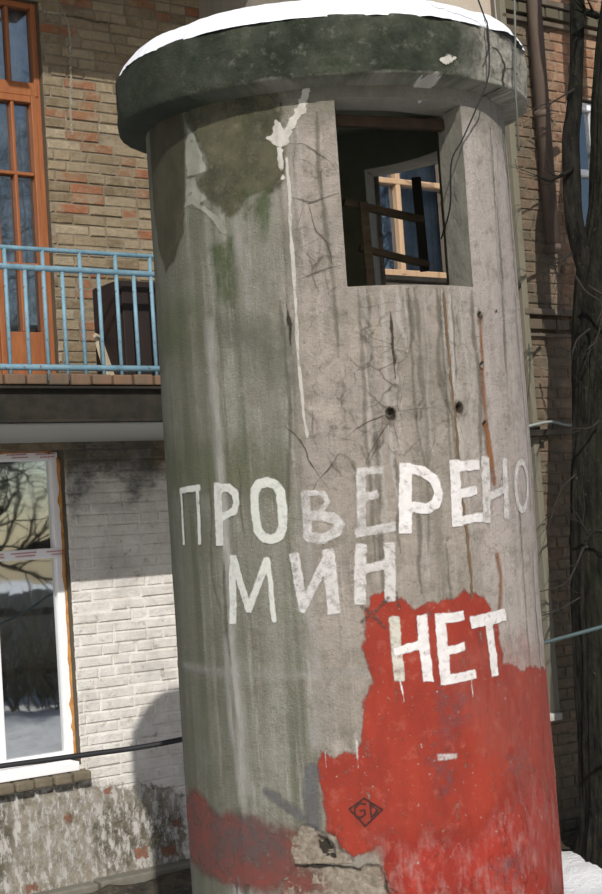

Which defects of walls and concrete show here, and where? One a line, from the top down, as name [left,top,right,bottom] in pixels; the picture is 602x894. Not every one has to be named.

peeling [184,126,227,234]
leakage [149,93,286,271]
leakage [213,238,233,299]
crack [285,304,293,345]
crack [296,193,341,279]
crack [377,312,400,390]
crack [442,292,474,599]
rust [480,319,496,485]
leakage [217,457,230,569]
leakage [229,624,246,792]
peeling [0,777,187,894]
spalling [283,825,398,894]